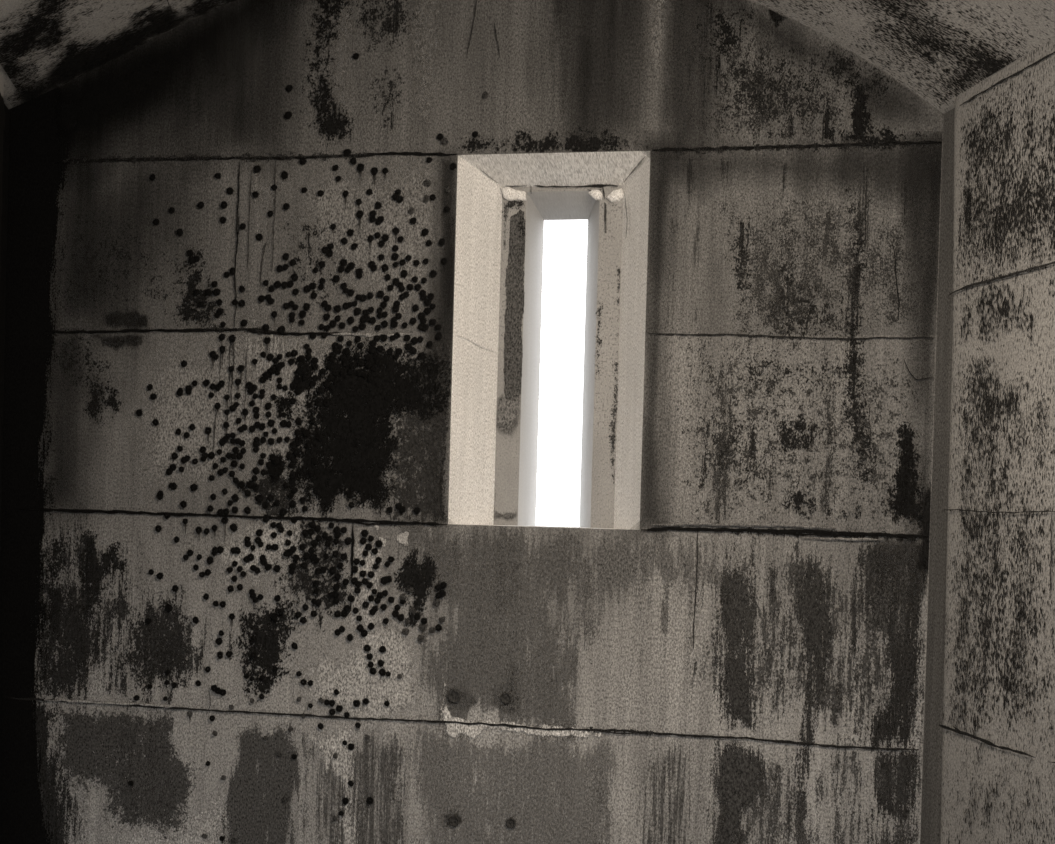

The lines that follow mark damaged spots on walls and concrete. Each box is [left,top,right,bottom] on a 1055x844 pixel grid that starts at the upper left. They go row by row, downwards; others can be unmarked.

water stain [300,0,437,195]
water stain [437,0,648,153]
water stain [392,189,403,203]
water stain [341,199,384,250]
water stain [368,232,389,248]
water stain [421,206,455,313]
water stain [938,65,1055,844]
water stain [334,625,353,642]
water stain [363,644,402,679]
water stain [318,689,350,718]
crack [939,724,1055,763]
water stain [637,745,697,844]